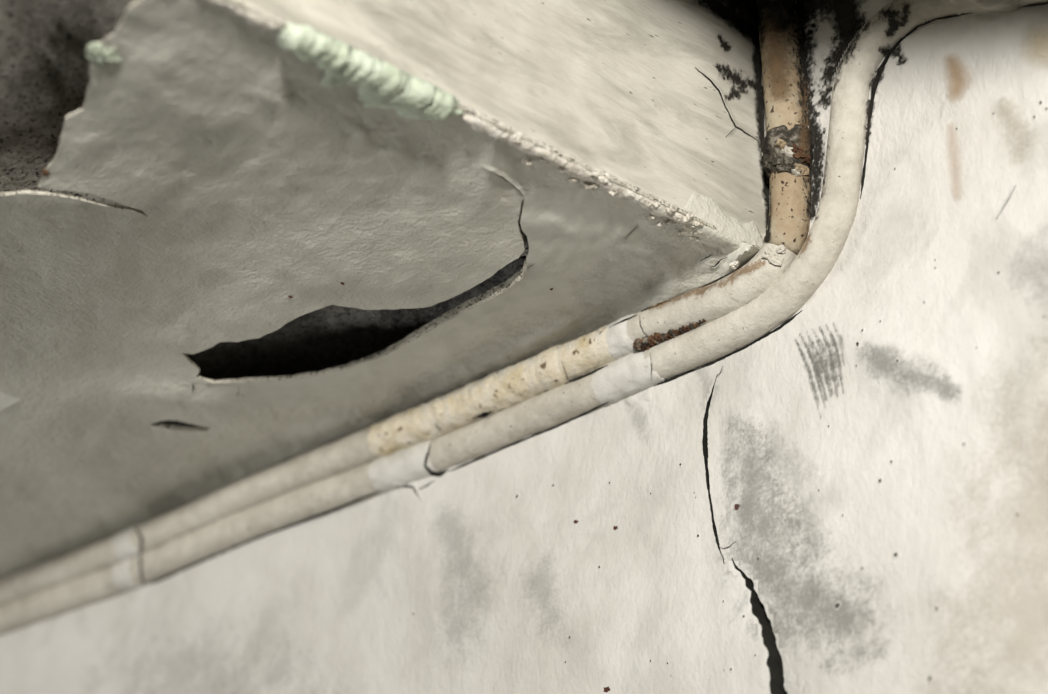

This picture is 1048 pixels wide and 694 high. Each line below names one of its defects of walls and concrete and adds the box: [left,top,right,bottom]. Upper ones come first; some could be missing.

water stain [698,0,911,243]
peeling [0,0,761,578]
crack [702,366,788,694]